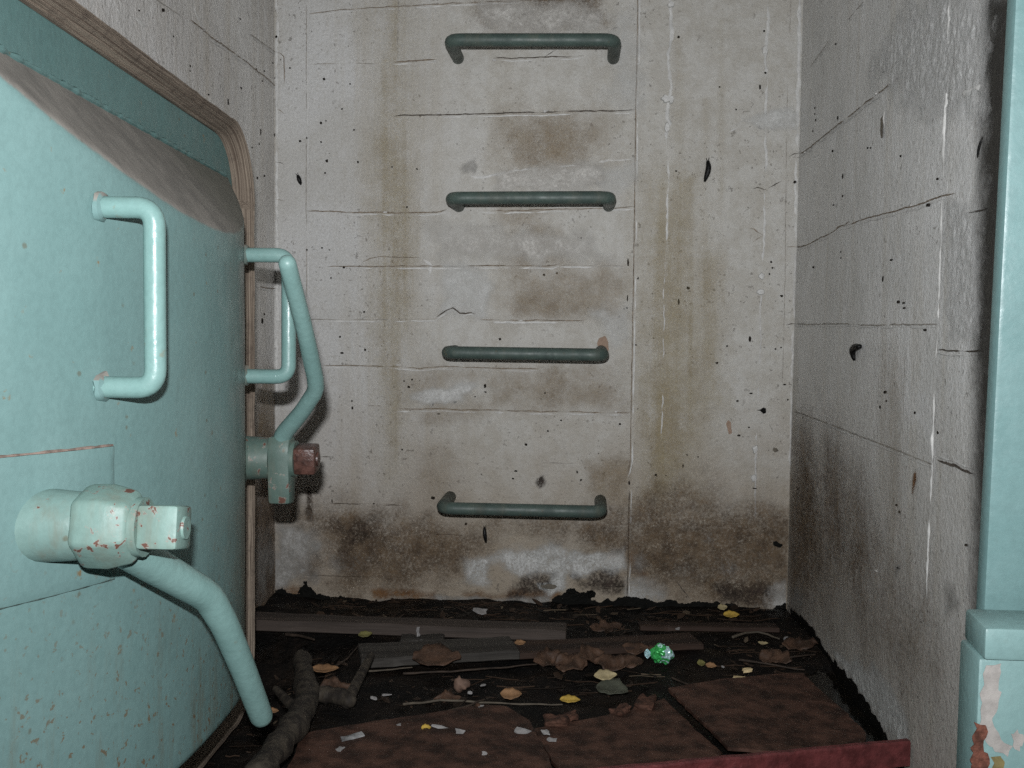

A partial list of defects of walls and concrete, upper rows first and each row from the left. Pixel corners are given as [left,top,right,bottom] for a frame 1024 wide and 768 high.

water stain [255,467,908,741]
peeling [980,663,1024,757]